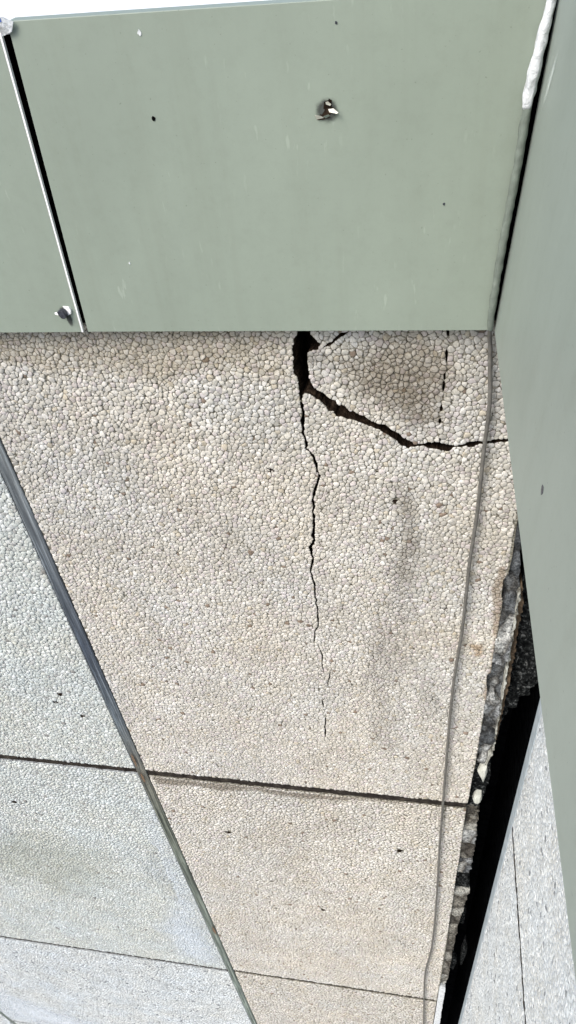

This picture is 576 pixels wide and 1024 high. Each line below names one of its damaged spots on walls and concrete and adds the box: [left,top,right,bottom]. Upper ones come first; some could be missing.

crack [292,330,508,736]
spalling [440,521,540,1024]